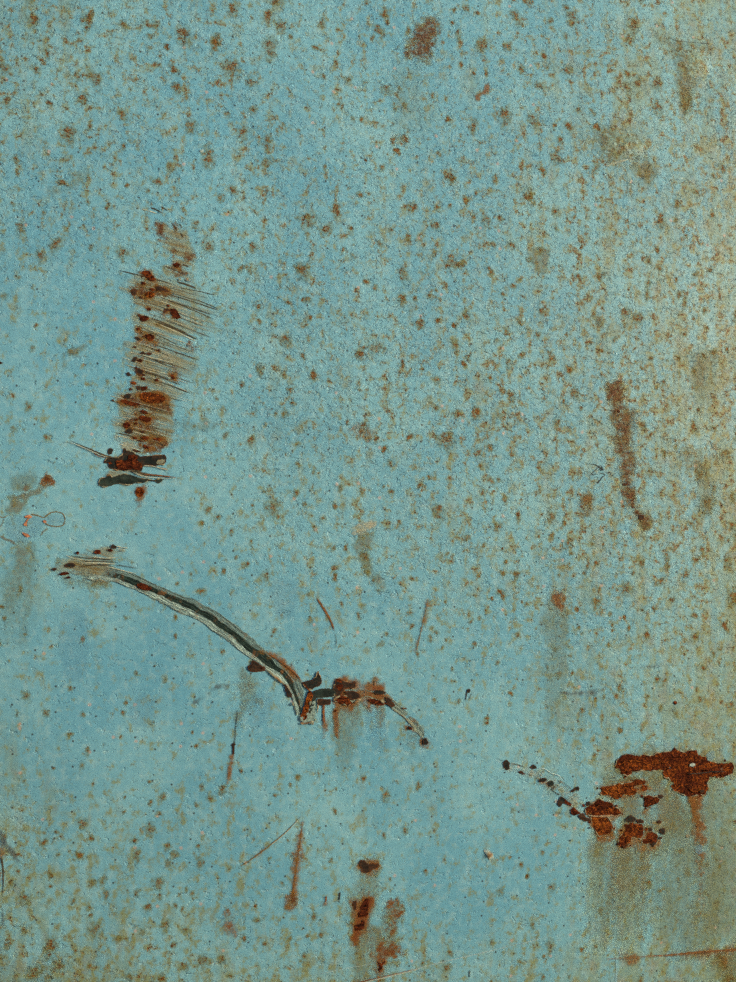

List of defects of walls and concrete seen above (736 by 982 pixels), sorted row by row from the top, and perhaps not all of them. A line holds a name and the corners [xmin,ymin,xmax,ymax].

rust [118,366,179,453]
rust [606,380,653,529]
spalling [52,544,429,748]
rust [323,705,339,738]
rust [573,747,735,885]
rust [282,832,303,910]
rust [357,859,391,880]
rust [349,896,404,982]